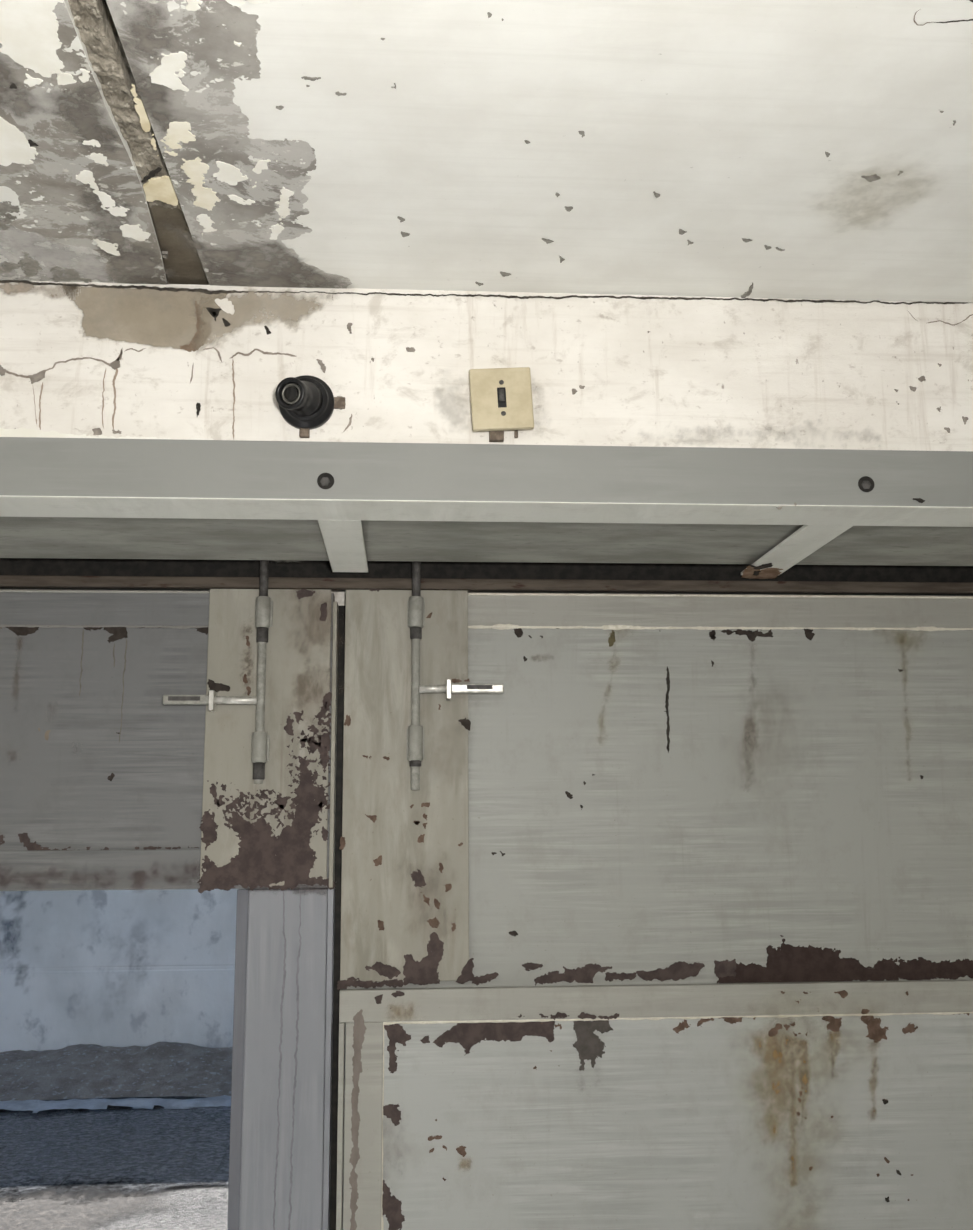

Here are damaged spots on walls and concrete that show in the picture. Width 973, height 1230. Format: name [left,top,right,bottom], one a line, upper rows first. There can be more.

peeling [0,0,172,285]
peeling [106,0,352,289]
crack [0,0,973,326]
damp [0,201,320,349]
crack [0,348,145,435]
crack [190,347,297,439]
corrosion [134,692,351,893]
corrosion [337,863,619,1073]
corrosion [522,935,973,1004]
corrosion [860,1009,918,1043]
corrosion [383,1104,401,1126]
corrosion [382,1180,405,1230]